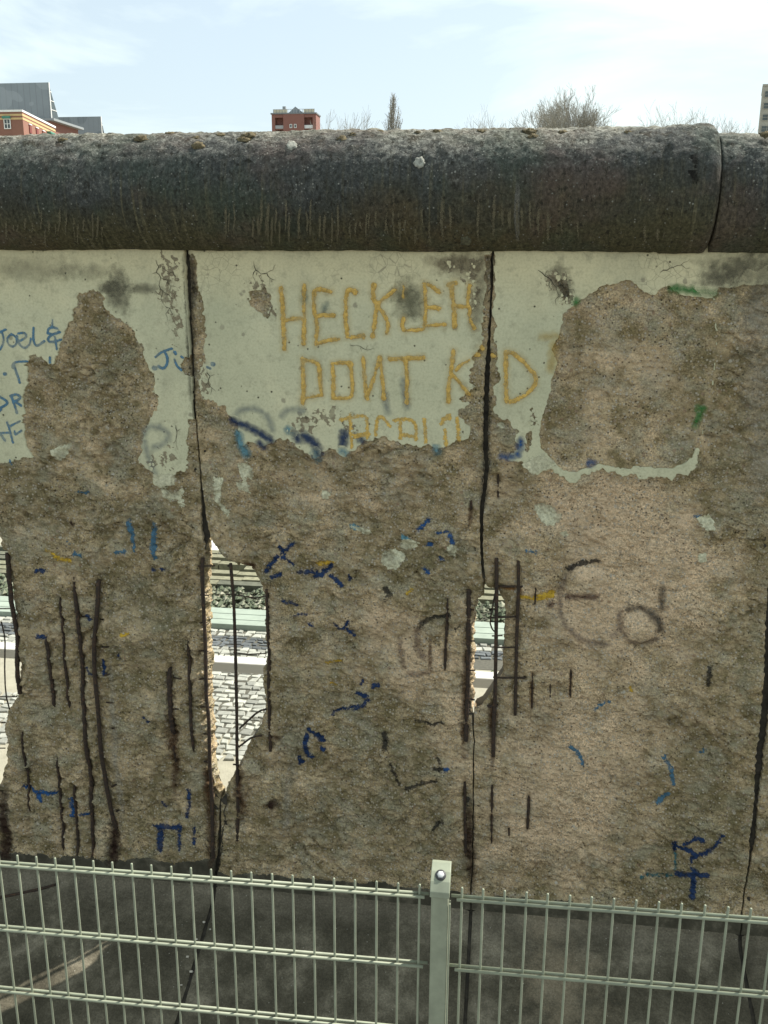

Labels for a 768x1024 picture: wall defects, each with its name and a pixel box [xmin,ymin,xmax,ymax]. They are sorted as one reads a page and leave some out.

damp [104,280,148,305]
crack [486,254,494,341]
spalling [0,250,768,920]
rust [108,824,119,864]